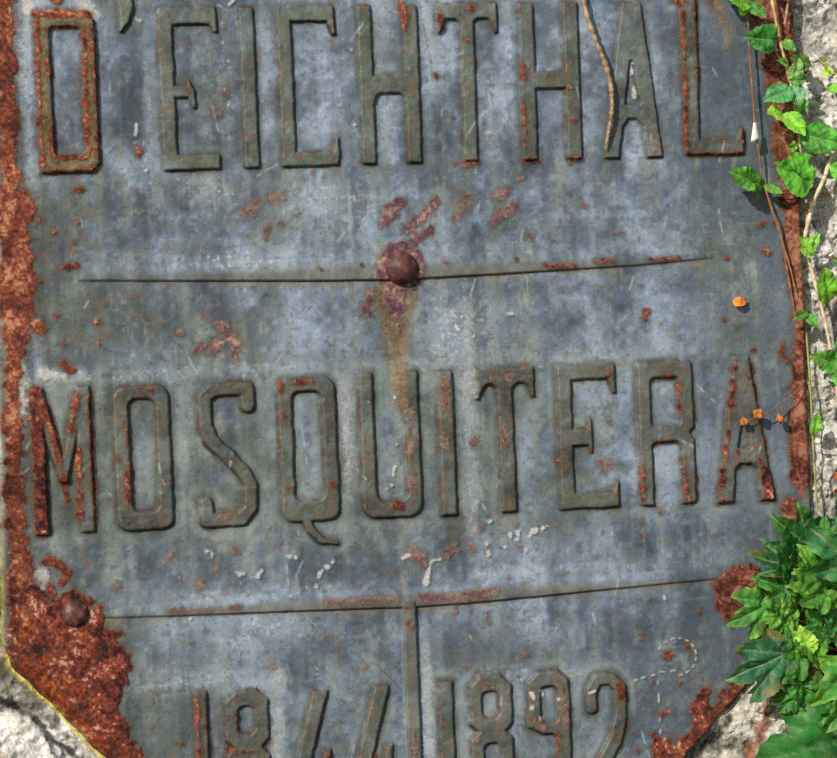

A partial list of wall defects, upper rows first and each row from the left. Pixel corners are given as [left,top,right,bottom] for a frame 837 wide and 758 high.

rust [669,0,745,158]
rust [751,0,796,89]
rust [489,188,519,226]
rust [360,195,440,334]
rust [192,321,242,360]
rust [717,101,811,522]
rust [0,0,144,758]
rust [418,587,499,614]
rust [712,563,761,622]
rust [193,698,211,758]
rust [650,682,747,758]
rust [746,696,772,758]